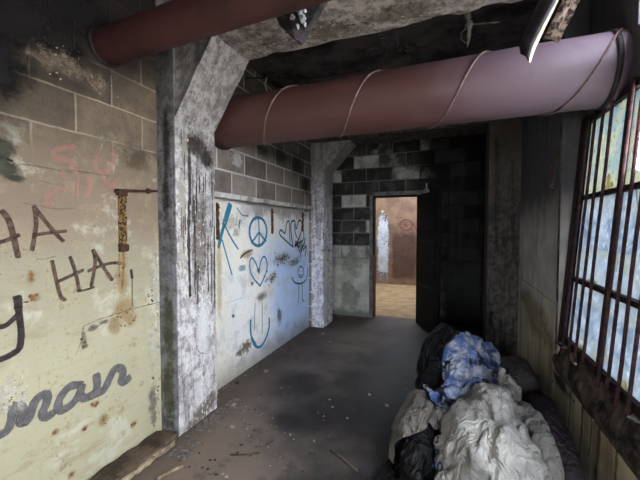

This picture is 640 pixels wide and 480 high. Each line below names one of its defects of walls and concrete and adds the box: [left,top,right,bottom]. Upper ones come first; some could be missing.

damp [183,131,213,166]